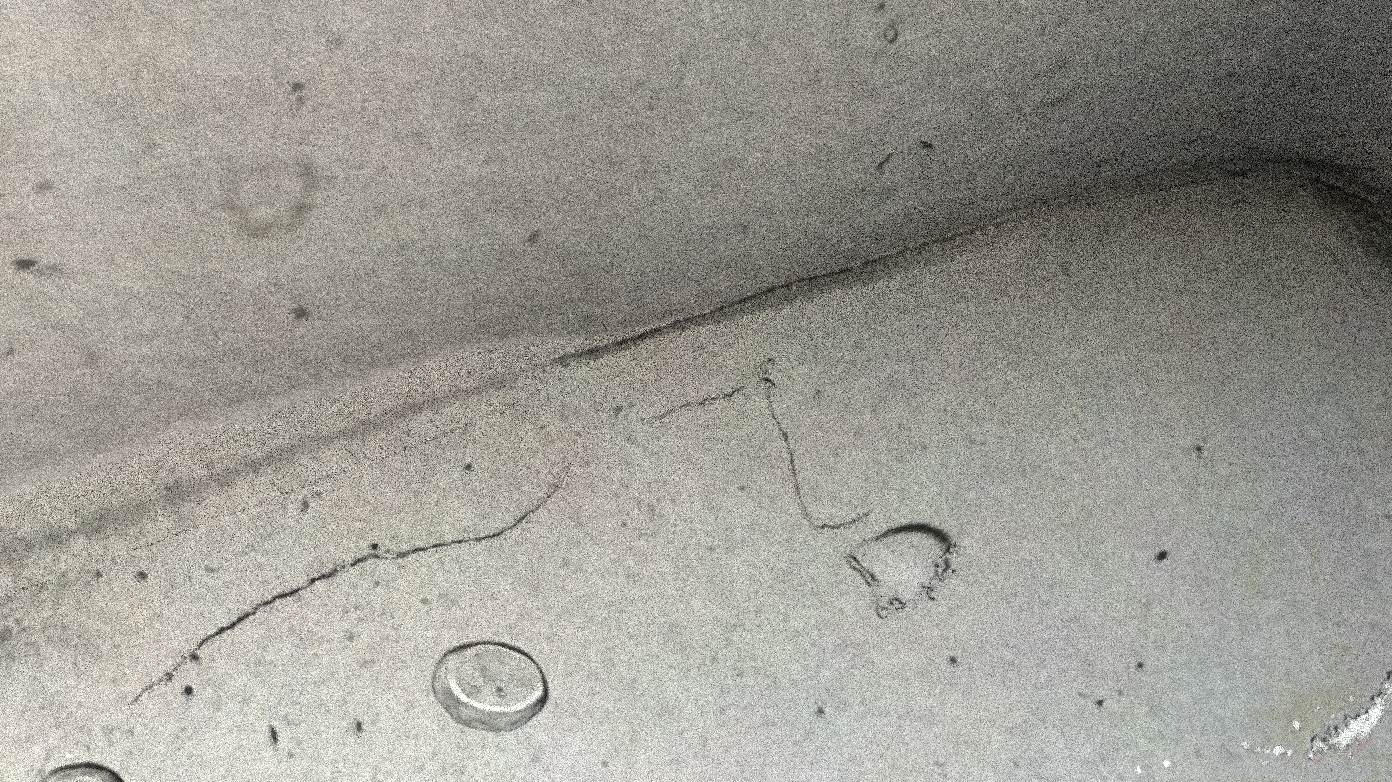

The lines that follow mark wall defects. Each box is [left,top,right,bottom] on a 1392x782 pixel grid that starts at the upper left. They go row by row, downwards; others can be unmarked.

crack [642,354,873,534]
crack [128,462,574,707]
peeling [837,517,962,619]
peeling [1241,660,1392,771]